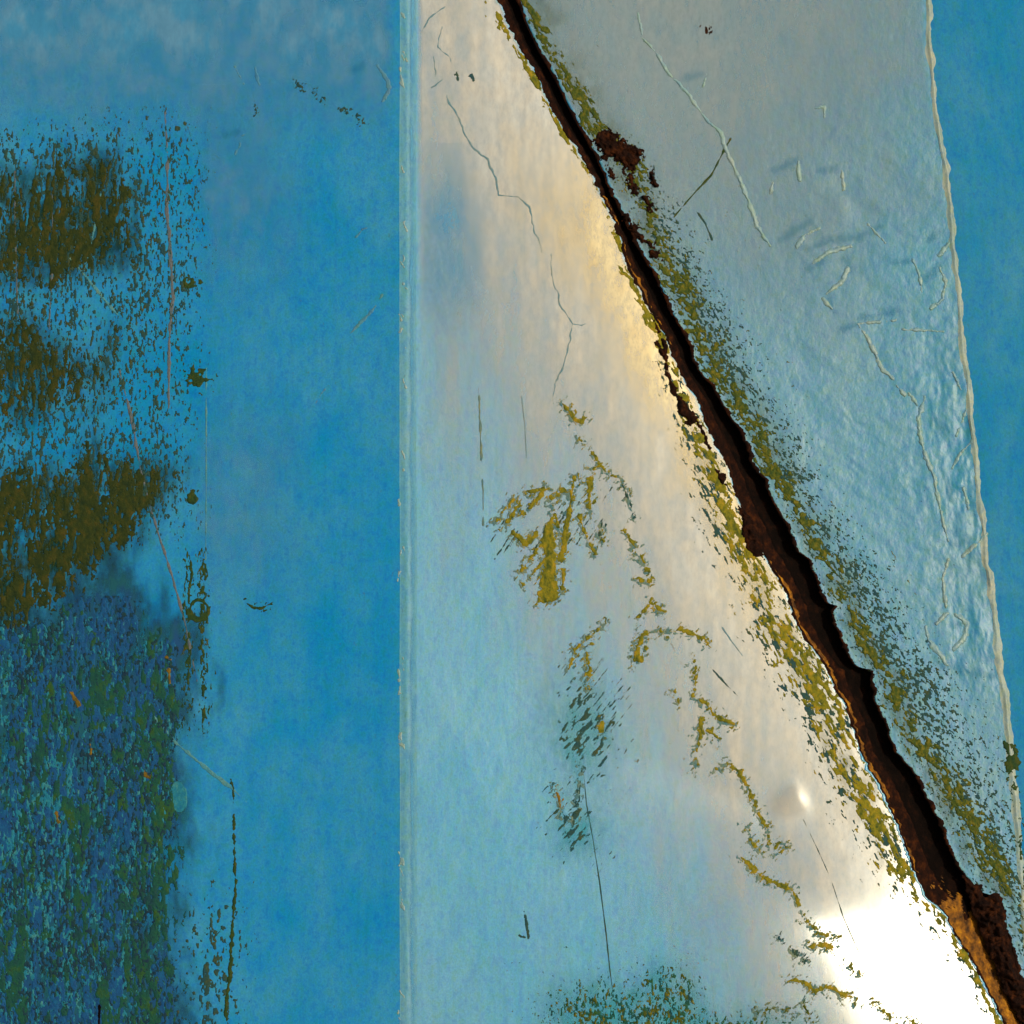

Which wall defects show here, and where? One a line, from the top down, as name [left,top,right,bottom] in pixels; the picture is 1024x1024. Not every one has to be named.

peeling [0,140,143,432]
crack [420,5,584,398]
rust [590,127,659,213]
peeling [420,0,1003,1024]
crack [497,0,1024,1024]
peeling [0,435,190,1024]
rust [961,875,1024,1023]